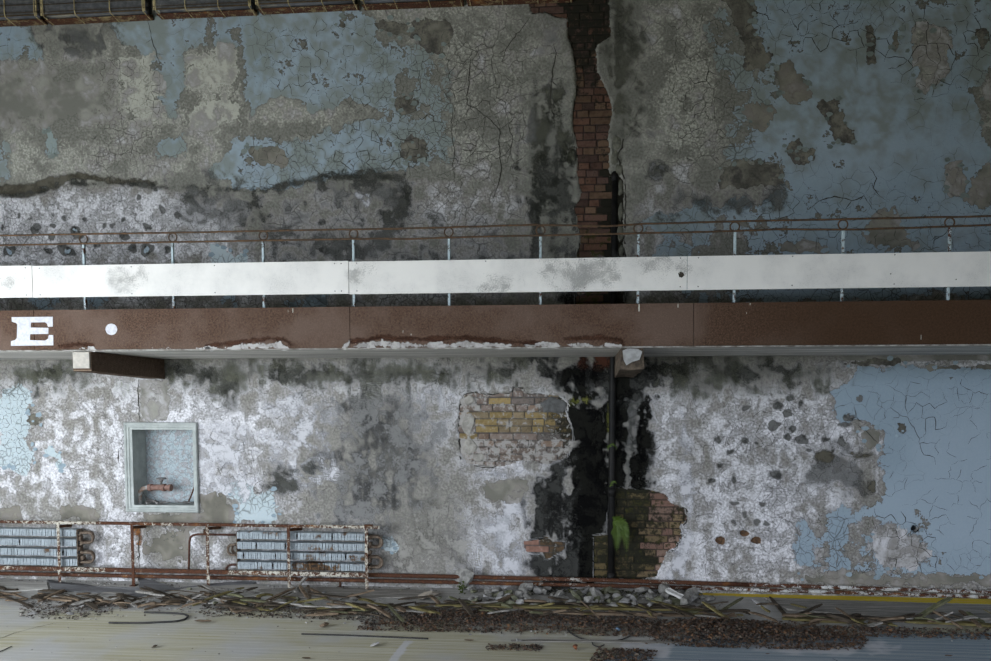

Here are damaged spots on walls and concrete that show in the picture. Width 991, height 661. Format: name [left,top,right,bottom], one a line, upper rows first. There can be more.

crack [0,189,241,266]
crack [93,23,165,167]
damp [511,78,582,259]
damp [558,292,578,304]
spalling [529,0,627,258]
spalling [576,291,624,304]
crack [664,0,991,173]
peeling [0,383,66,476]
damp [164,334,845,590]
spalling [458,386,572,468]
spalling [594,488,688,579]
crack [691,379,991,580]